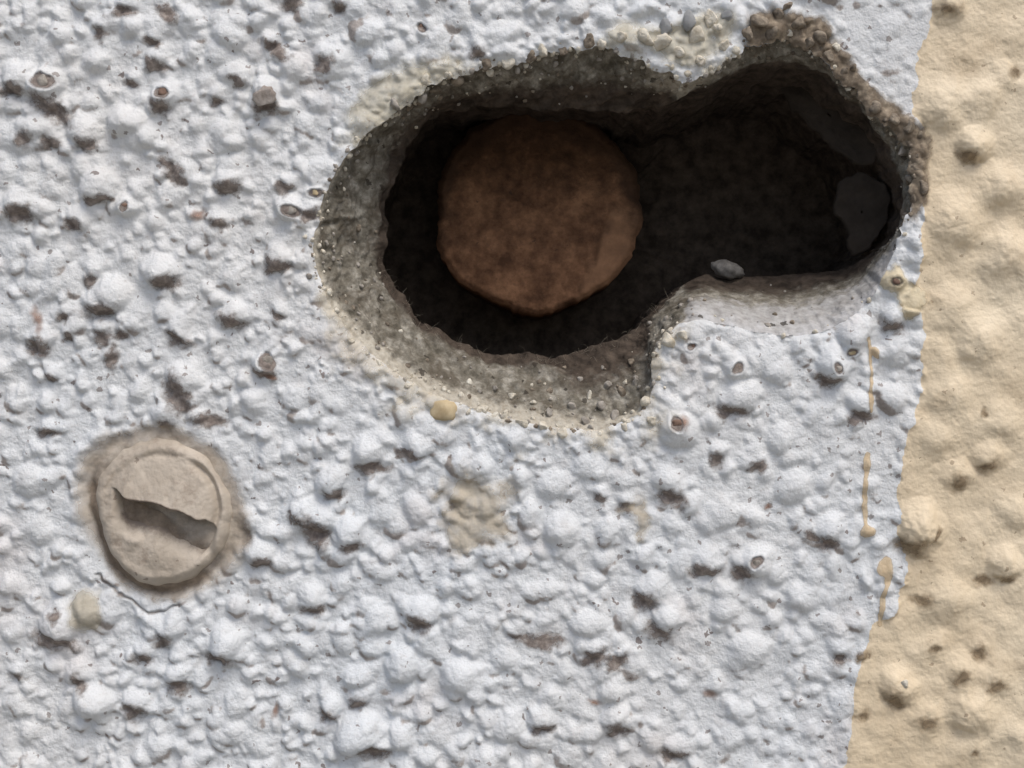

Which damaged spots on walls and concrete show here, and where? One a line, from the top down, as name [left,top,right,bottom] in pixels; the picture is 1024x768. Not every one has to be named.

spalling [275,2,929,439]